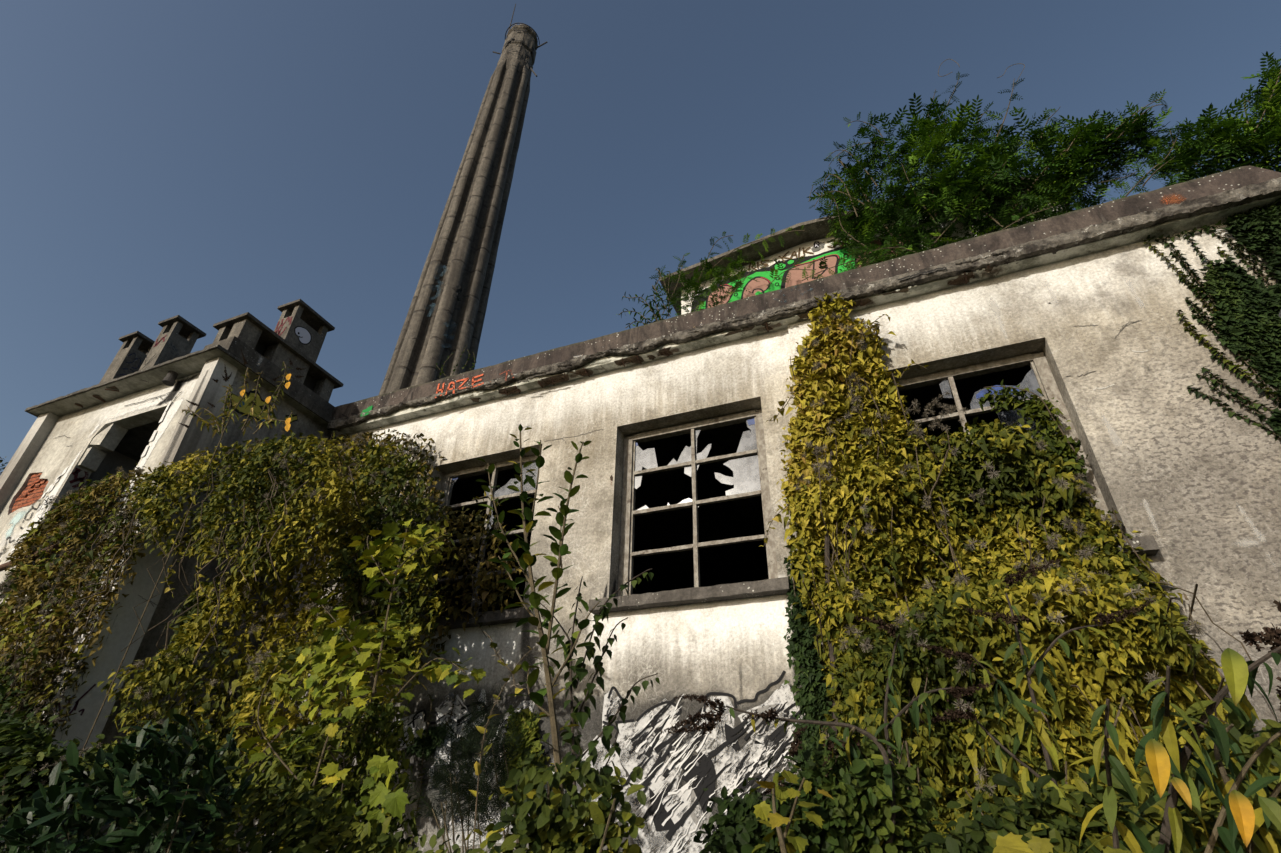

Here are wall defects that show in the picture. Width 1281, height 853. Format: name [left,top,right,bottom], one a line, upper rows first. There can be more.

spalling [75,386,119,408]
flaking render [10,397,184,553]